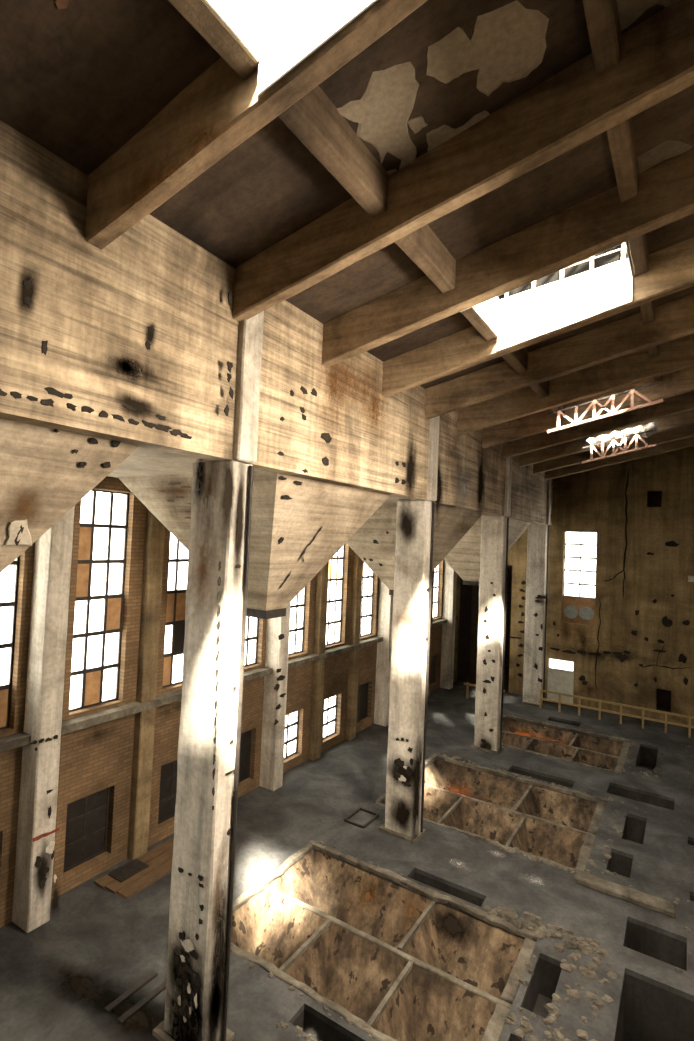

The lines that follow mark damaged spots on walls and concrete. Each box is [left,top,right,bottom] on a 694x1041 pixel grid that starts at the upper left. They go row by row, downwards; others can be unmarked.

peeling [337,0,549,175]
water stain [413,741,422,840]
peeling [168,904,205,1041]